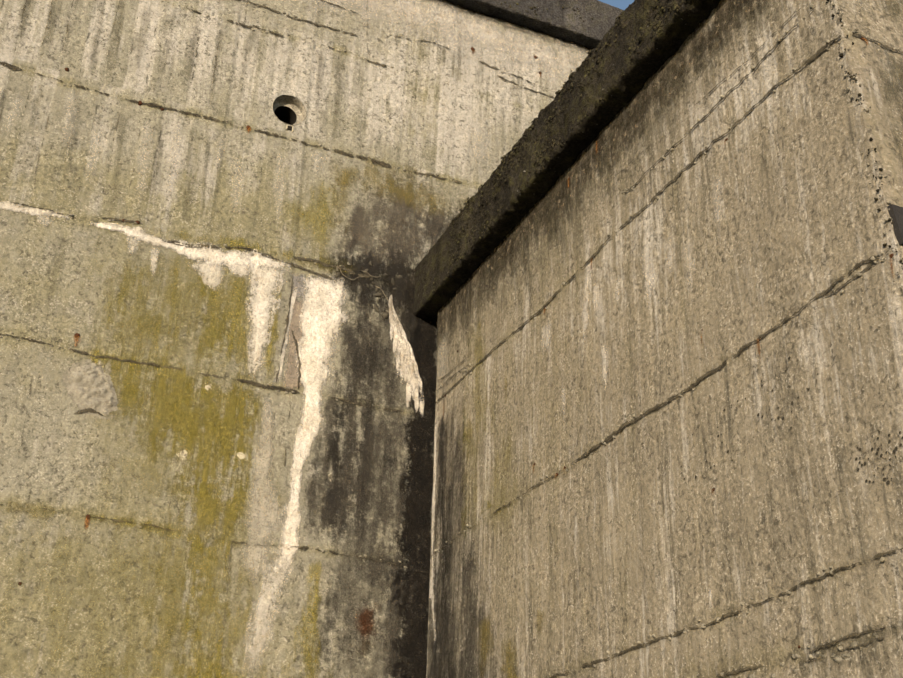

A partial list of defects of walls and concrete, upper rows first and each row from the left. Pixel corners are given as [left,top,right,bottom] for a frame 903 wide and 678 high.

water stain [0,202,62,217]
water stain [93,0,761,678]
rust [358,609,374,655]